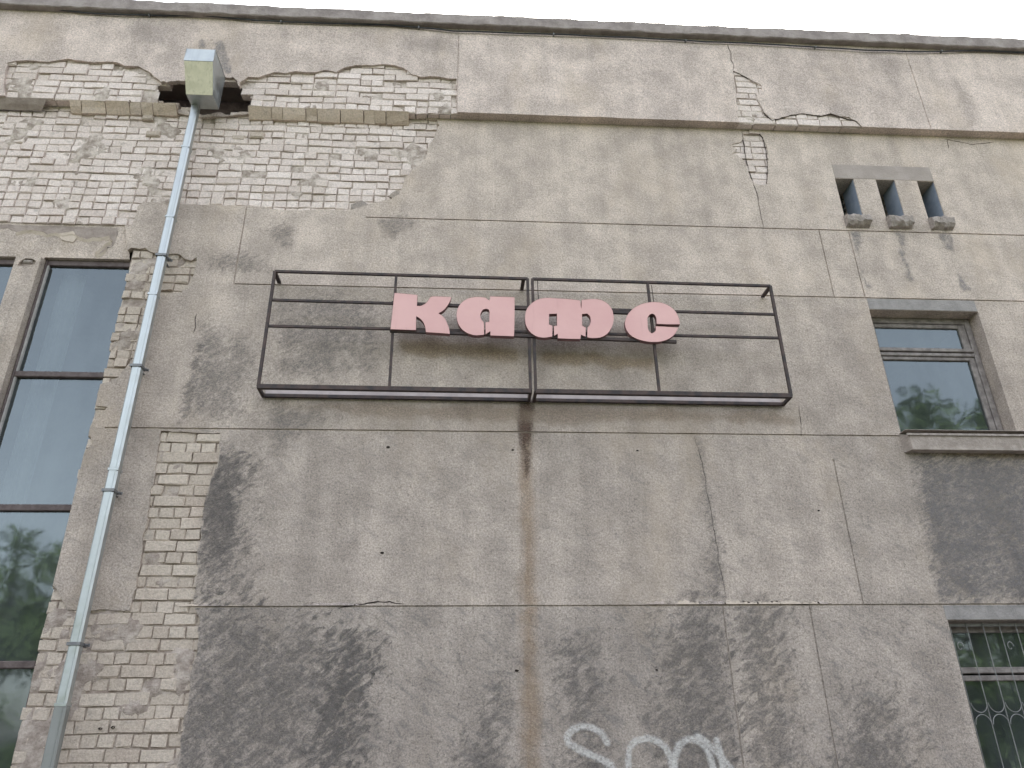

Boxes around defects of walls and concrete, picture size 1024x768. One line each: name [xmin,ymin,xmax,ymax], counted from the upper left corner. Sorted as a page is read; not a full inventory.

spalling [0,61,461,258]
crack [728,47,862,229]
spalling [731,72,864,185]
spalling [92,248,197,428]
spalling [10,587,77,768]
spalling [57,428,239,768]
water stain [180,451,381,768]
water stain [646,597,803,768]
water stain [916,453,1024,603]